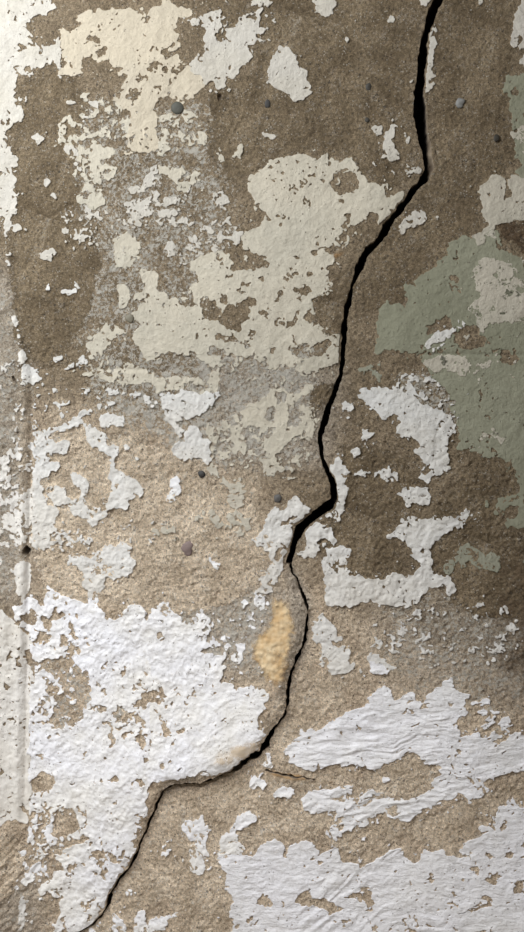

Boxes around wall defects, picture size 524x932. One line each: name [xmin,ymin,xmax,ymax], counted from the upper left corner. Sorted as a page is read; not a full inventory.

peeling [182,110,198,124]
peeling [104,165,201,269]
peeling [212,191,230,210]
peeling [117,284,131,309]
peeling [96,386,141,430]
crack [80,0,443,932]
peeling [282,447,310,480]
peeling [228,641,245,675]
peeling [471,696,500,730]
peeling [16,861,49,886]
peeling [18,896,33,931]